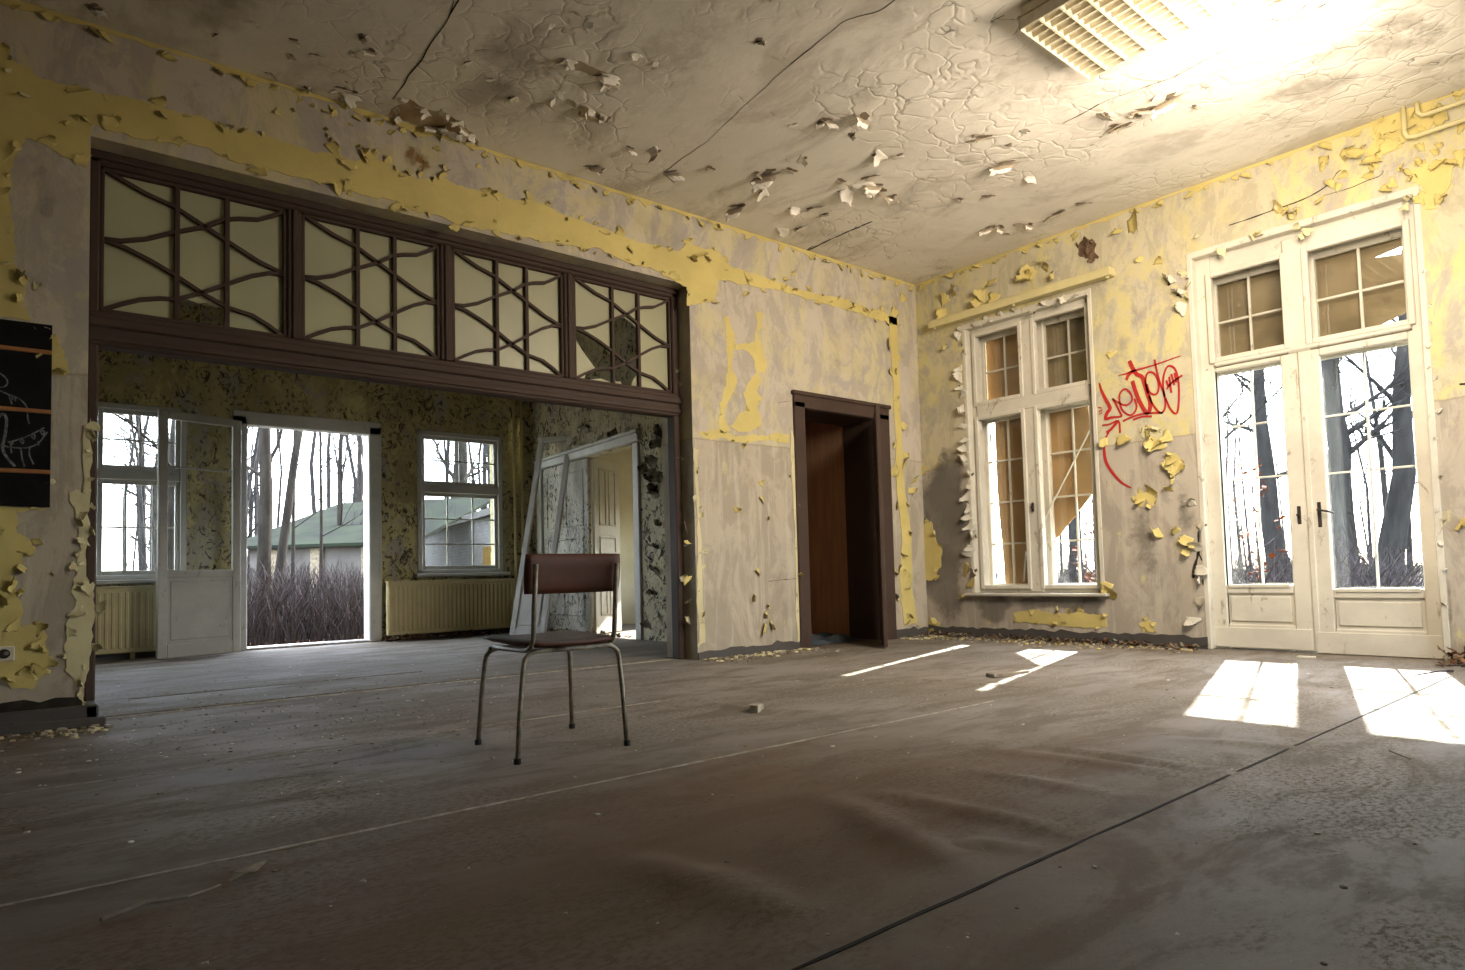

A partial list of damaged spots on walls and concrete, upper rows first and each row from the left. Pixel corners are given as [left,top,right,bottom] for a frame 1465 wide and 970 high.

crack [393,0,459,99]
peeling [0,0,1465,648]
peeling [0,419,107,706]
leakage [924,459,975,617]
leakage [979,592,1101,622]